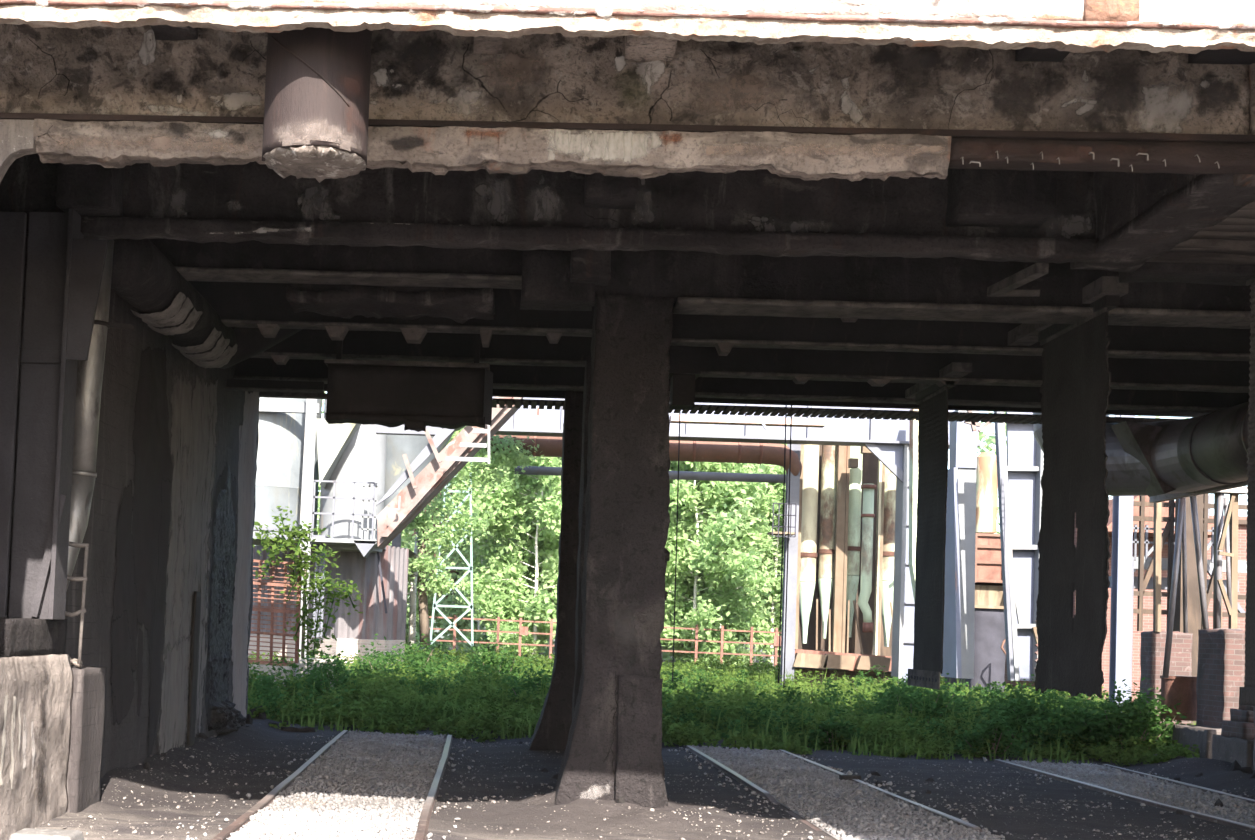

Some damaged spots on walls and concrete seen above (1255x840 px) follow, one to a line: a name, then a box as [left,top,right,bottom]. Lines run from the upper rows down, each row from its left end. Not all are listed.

crack [28,38,70,97]
crack [462,44,588,122]
crack [648,71,672,124]
leakage [873,46,988,98]
leakage [992,69,1064,123]
leakage [1061,62,1239,134]